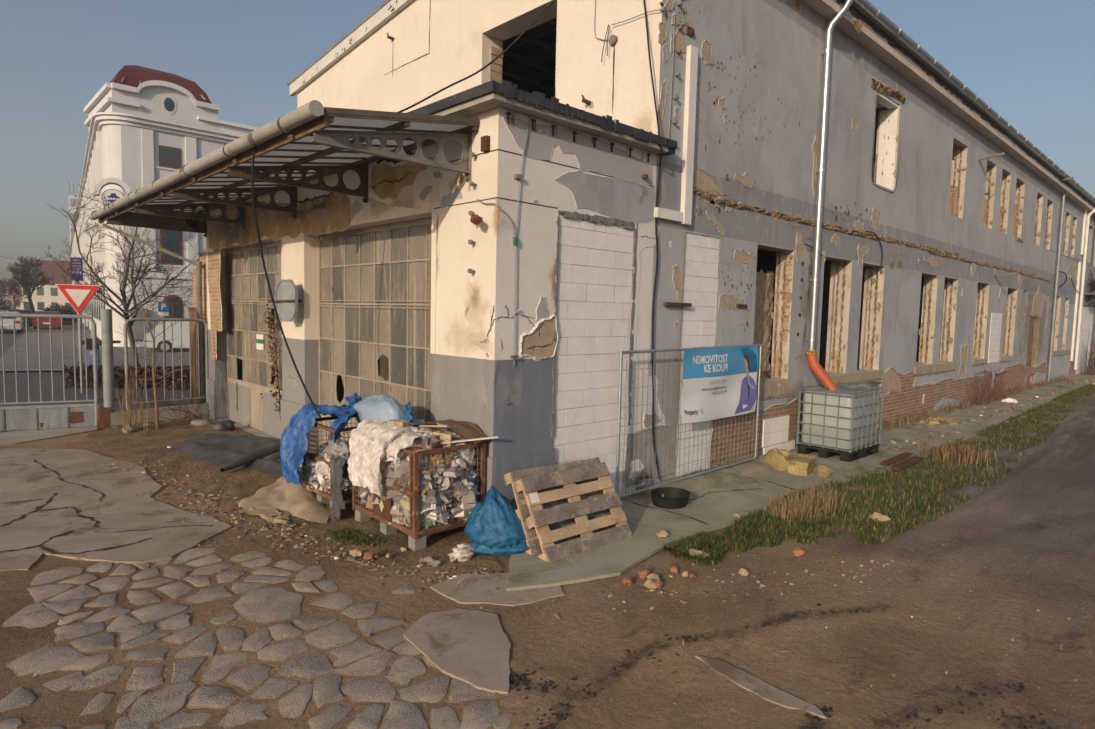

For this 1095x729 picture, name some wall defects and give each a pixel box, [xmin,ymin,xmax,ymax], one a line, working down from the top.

peeling [658,0,700,63]
peeling [658,79,680,123]
peeling [696,40,800,157]
spalling [836,0,1095,208]
spalling [370,156,464,208]
peeling [746,202,881,268]
flaking render [983,198,1020,237]
spalling [207,193,363,360]
crack [481,305,552,351]
peeling [503,117,756,488]
flaking render [823,341,1094,427]
flaking render [708,393,801,468]